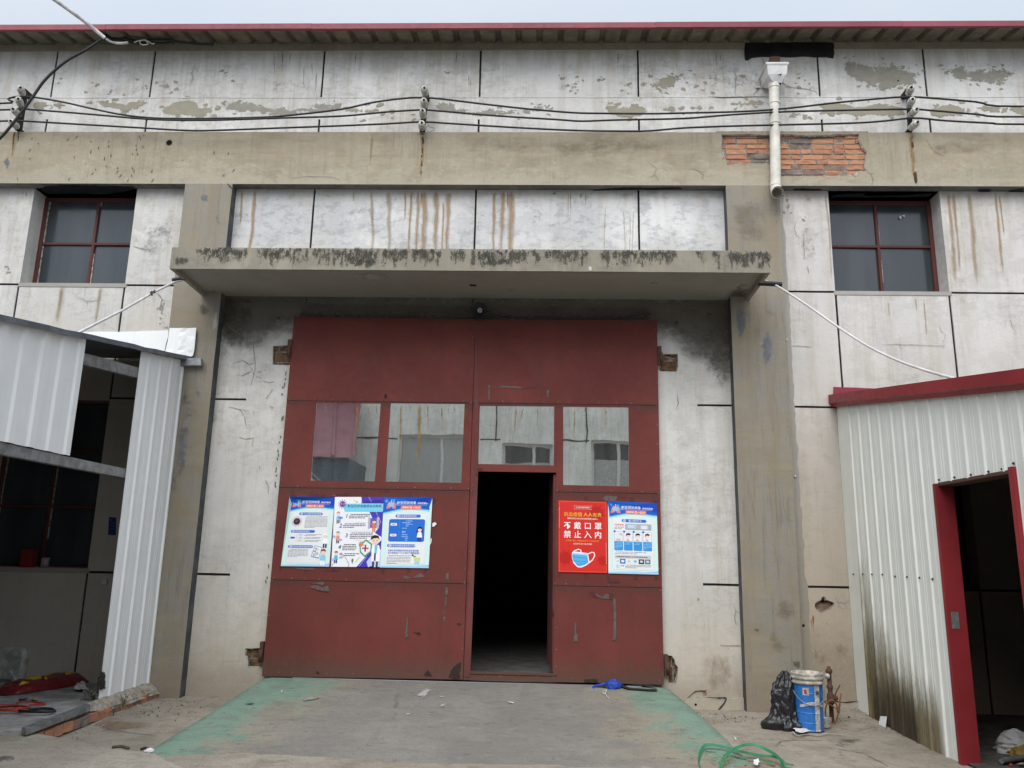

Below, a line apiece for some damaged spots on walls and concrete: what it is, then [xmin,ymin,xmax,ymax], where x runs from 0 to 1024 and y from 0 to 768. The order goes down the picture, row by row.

peeling [84,78,394,123]
peeling [606,70,715,119]
flaking render [716,56,924,221]
corrosion [405,193,451,249]
corrosion [493,193,514,249]
corrosion [948,196,960,272]
corrosion [968,197,977,271]
corrosion [995,197,1004,266]
water stain [201,247,588,280]
spalling [815,597,834,624]
spalling [245,648,262,668]
water stain [865,650,942,754]